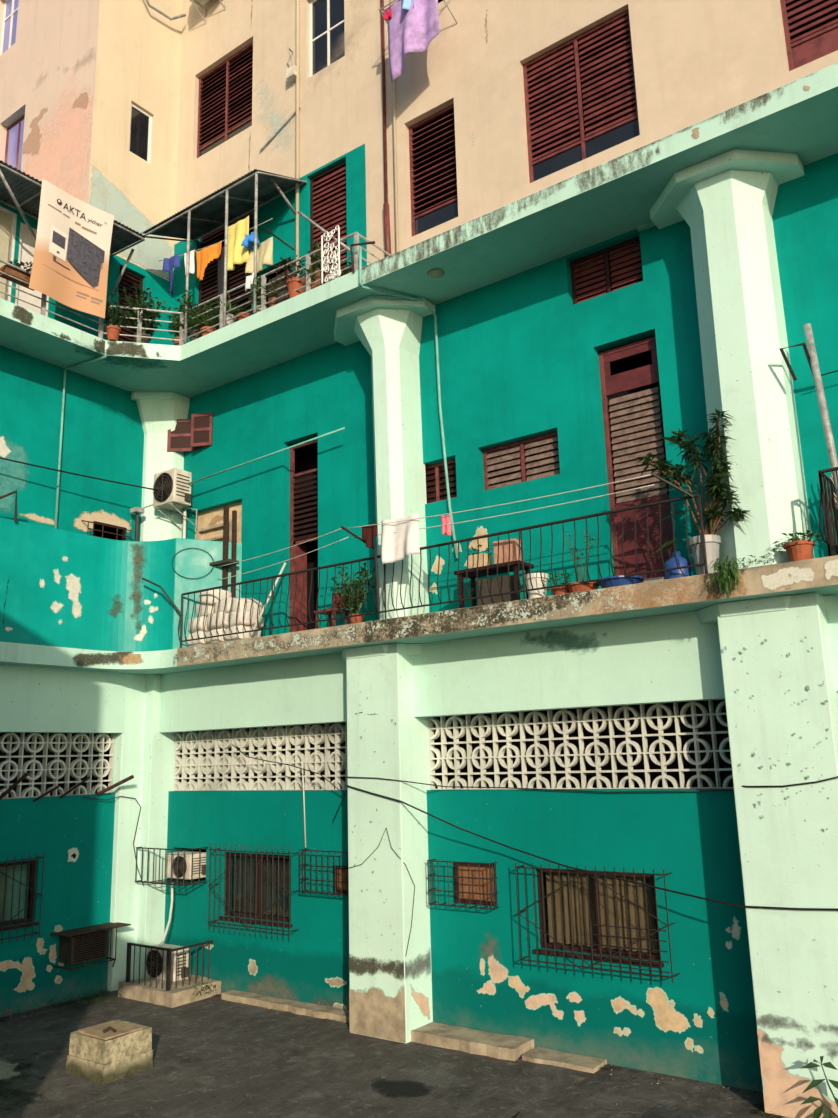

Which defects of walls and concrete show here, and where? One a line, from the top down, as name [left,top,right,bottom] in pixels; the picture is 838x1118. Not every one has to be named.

leakage [362,207,505,282]
peeling [39,556,82,625]
leakage [112,545,143,628]
leakage [322,590,592,643]
leakage [526,632,593,649]
peeling [0,925,64,993]
flaking render [325,976,431,1043]
leakage [349,953,431,978]
peeling [477,954,586,1026]
peeling [611,987,729,1054]
leakage [757,1016,799,1043]
flaking render [757,1028,838,1118]